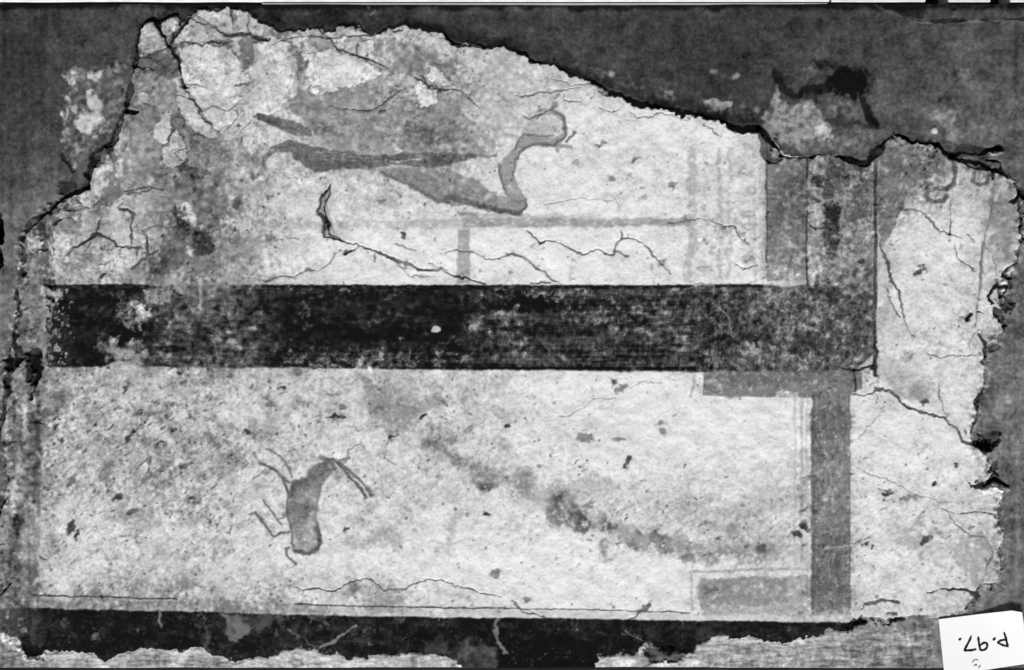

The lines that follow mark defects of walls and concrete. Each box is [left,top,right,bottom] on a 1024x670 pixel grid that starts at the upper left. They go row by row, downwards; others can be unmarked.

peeling [139,6,382,169]
peeling [416,65,456,107]
peeling [787,93,878,158]
spalling [0,63,151,270]
spalling [43,278,61,292]
crack [0,10,481,433]
crack [249,183,733,337]
crack [444,33,1024,448]
spalling [993,280,1017,329]
spalling [968,428,1010,495]
spalling [21,630,43,660]
spalling [637,643,690,665]